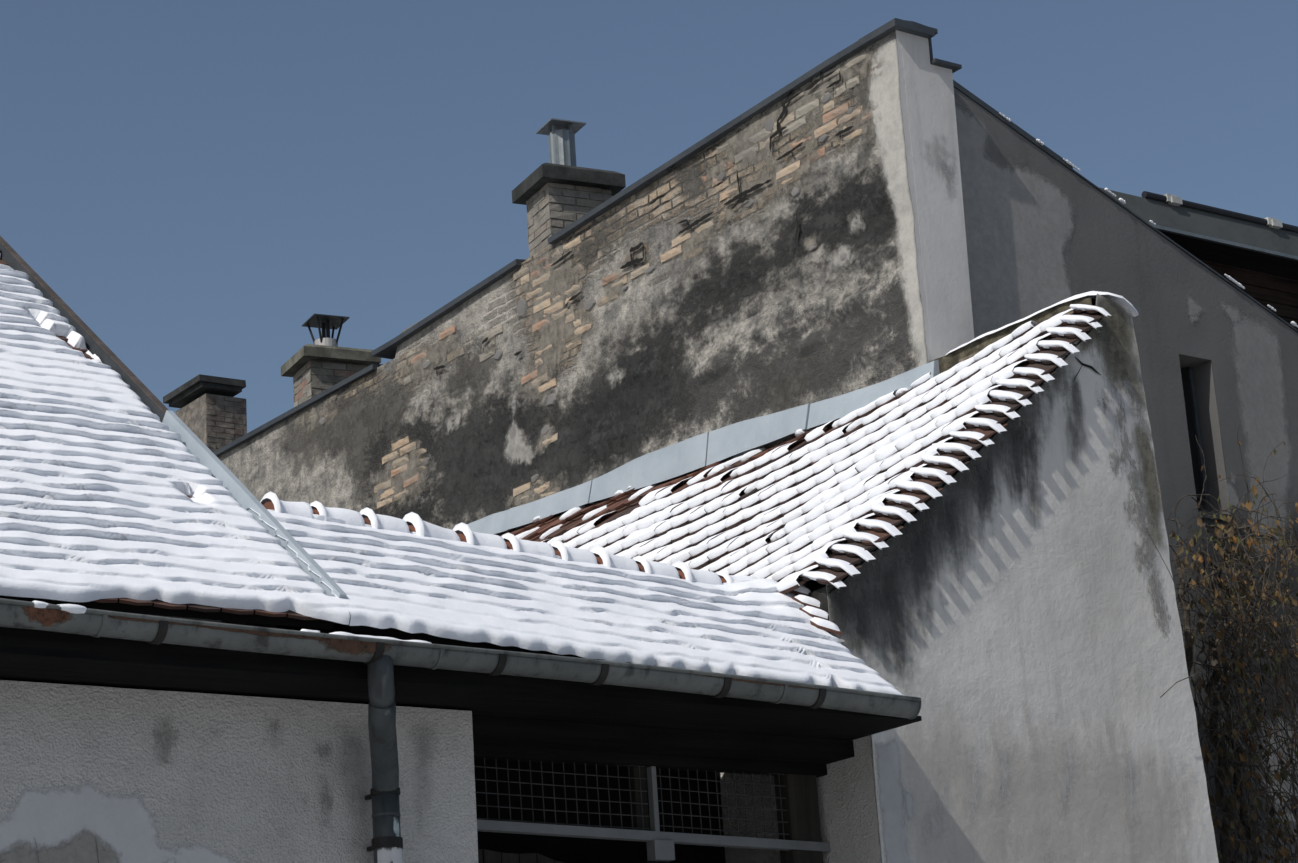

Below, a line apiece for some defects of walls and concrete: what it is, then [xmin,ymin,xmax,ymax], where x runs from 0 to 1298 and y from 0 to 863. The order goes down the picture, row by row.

spalling [512,49,881,407]
leakage [704,176,895,300]
leakage [489,400,525,440]
spalling [536,424,558,451]
leakage [578,327,683,463]
spalling [508,474,560,507]
leakage [827,367,1082,669]
corrosion [23,606,71,627]
peeling [0,782,236,863]